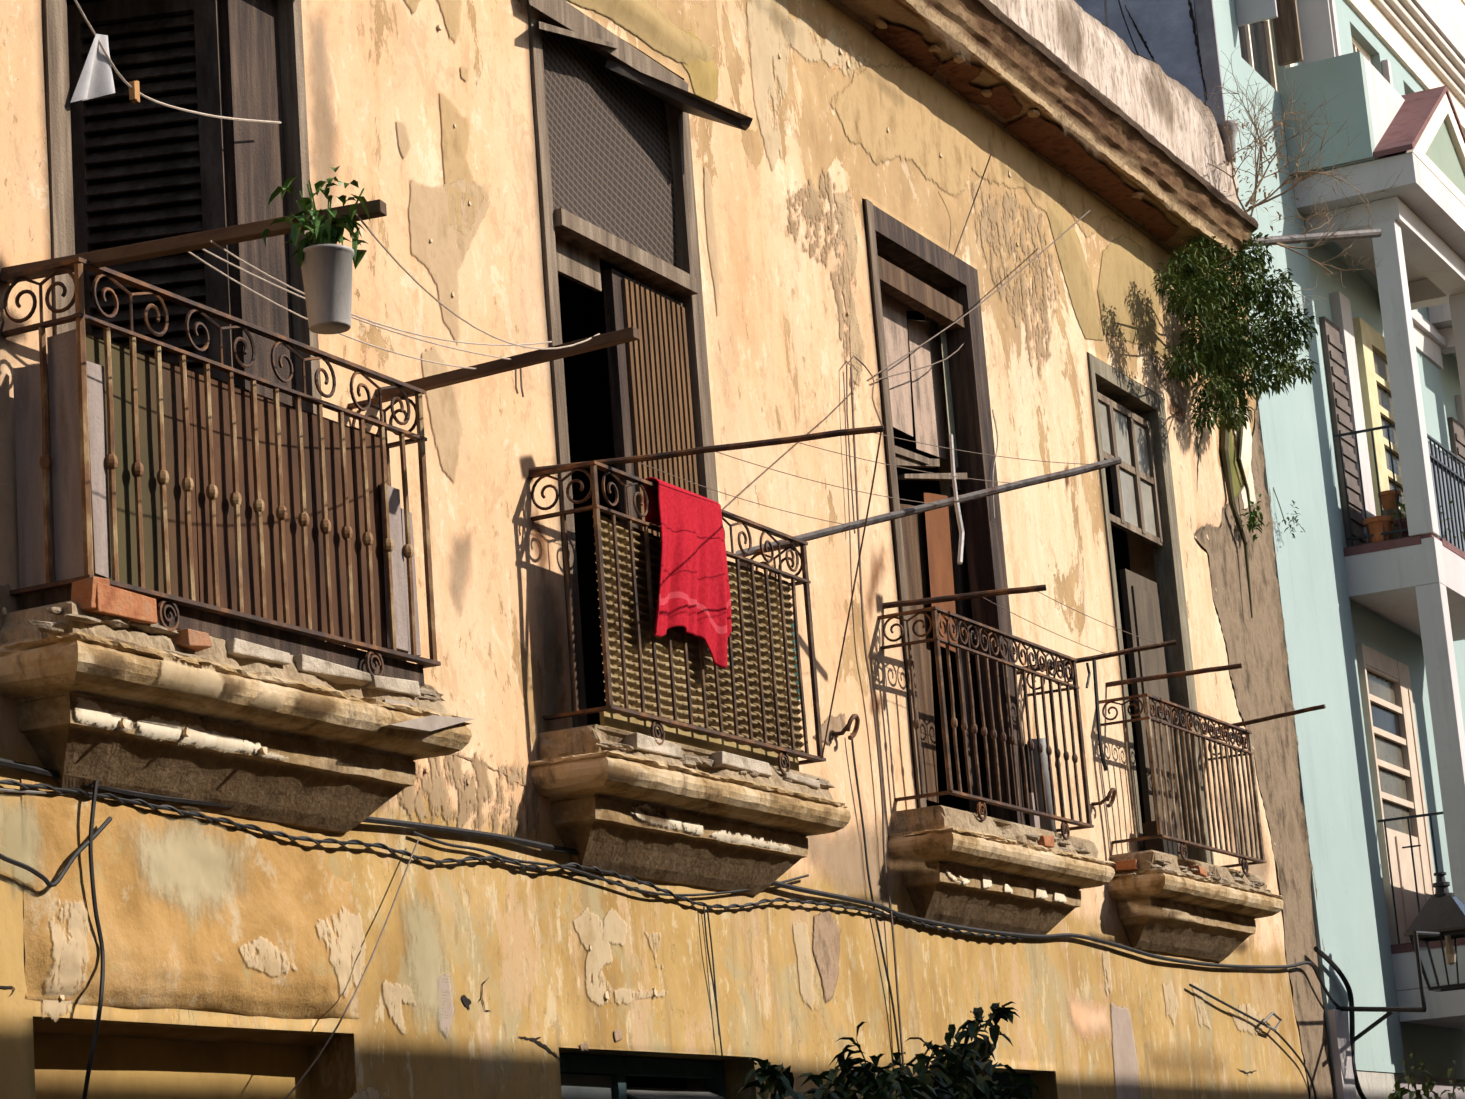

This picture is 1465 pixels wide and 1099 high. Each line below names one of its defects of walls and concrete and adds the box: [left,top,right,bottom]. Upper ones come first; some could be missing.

peeling [405,0,420,14]
peeling [437,0,462,44]
flaking render [569,0,719,102]
peeling [397,121,411,158]
peeling [409,92,490,345]
peeling [422,345,464,483]
flaking render [399,750,540,844]
peeling [42,899,90,1022]
peeling [240,936,297,976]
peeling [316,904,366,998]
peeling [383,901,454,1038]
peeling [574,908,668,1006]